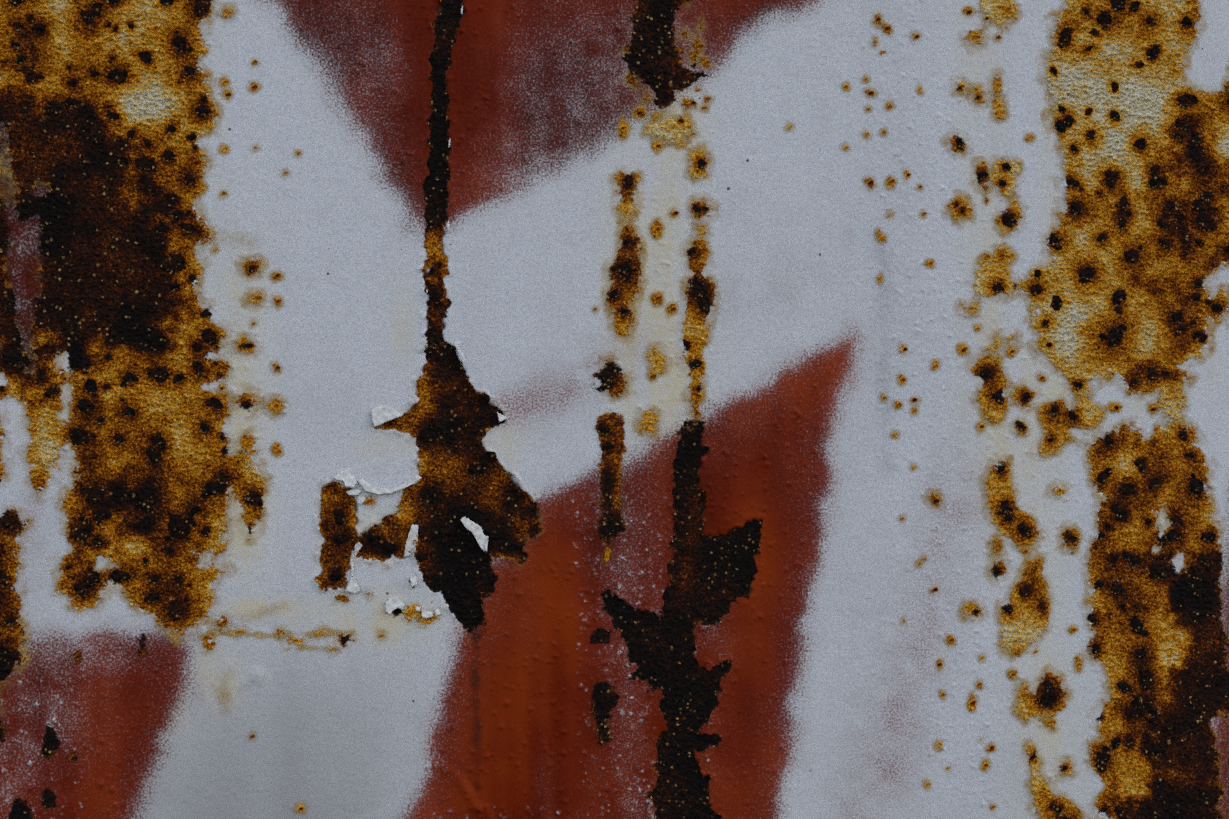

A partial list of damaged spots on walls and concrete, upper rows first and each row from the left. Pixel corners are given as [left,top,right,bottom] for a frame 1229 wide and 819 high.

rust [617,0,713,182]
rust [842,76,893,112]
rust [872,13,893,56]
rust [864,170,922,190]
rust [0,0,285,651]
peeling [314,343,542,633]
rust [590,170,763,819]
rust [944,0,1229,819]
rust [0,508,32,688]
rust [137,633,148,658]
rust [8,787,56,819]
rust [41,726,77,762]